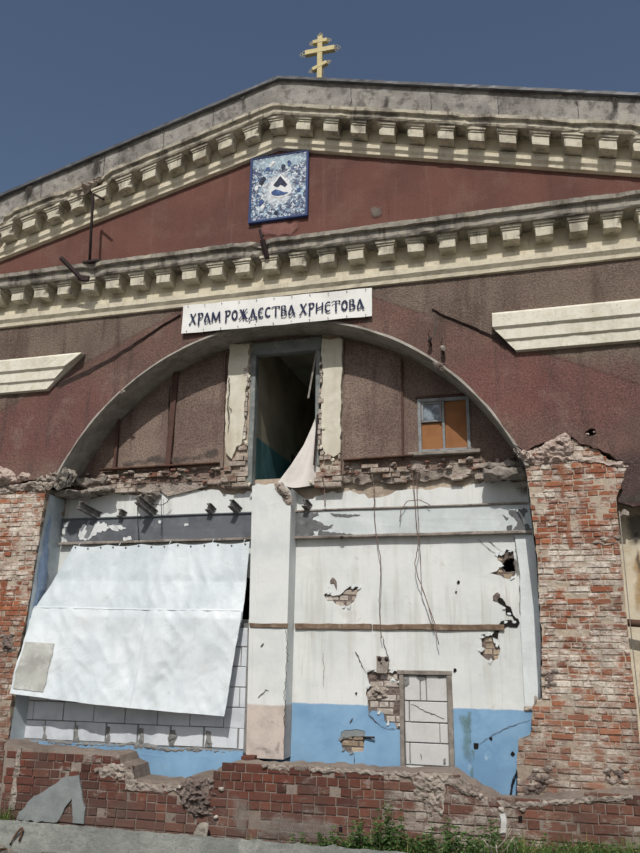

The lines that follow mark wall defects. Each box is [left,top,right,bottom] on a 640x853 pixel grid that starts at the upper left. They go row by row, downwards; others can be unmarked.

spalling [220,345,251,489]
spalling [309,344,344,489]
spalling [513,448,630,467]
peeling [78,522,132,541]
peeling [274,482,359,536]
peeling [503,508,533,531]
hole [492,549,515,580]
spalling [325,577,361,609]
spalling [478,632,500,664]
spalling [355,667,400,729]
spalling [338,729,375,754]
spalling [94,763,224,819]